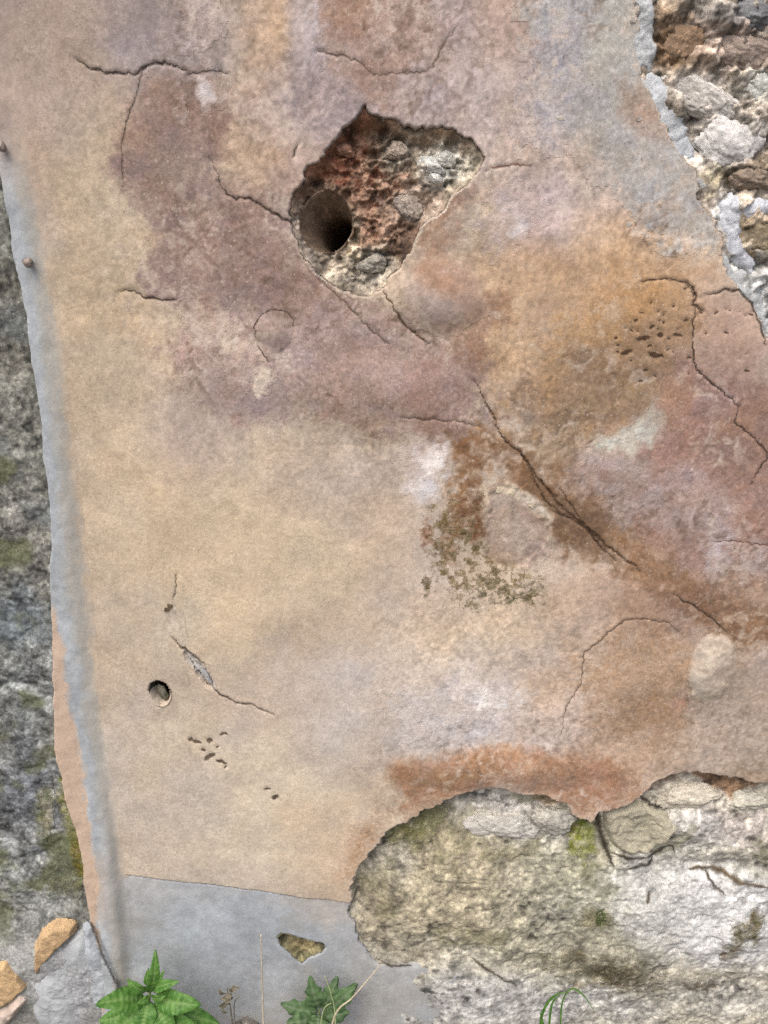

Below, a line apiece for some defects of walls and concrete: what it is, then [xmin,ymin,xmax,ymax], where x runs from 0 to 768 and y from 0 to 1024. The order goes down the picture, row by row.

crack [77,59,224,180]
crack [210,158,299,232]
flaking render [289,106,484,297]
flaking render [505,0,768,338]
crack [400,380,639,571]
spalling [614,301,683,361]
crack [642,278,768,483]
damp [420,574,432,599]
damp [450,571,553,608]
corrosion [329,612,699,887]
flaking render [277,933,325,963]
flaking render [348,771,768,1024]